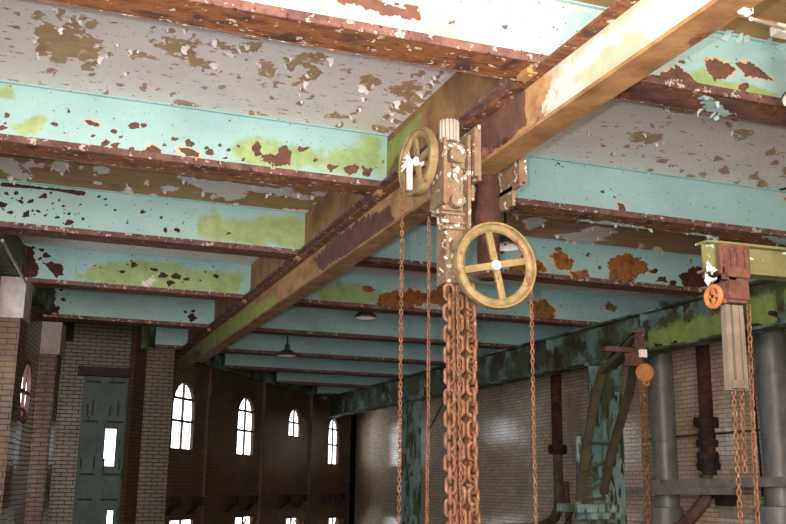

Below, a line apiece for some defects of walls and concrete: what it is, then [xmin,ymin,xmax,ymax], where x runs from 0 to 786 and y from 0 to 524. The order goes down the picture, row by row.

corrosion [255,0,508,45]
peeling [30,8,334,107]
peeling [324,69,445,133]
peeling [653,94,755,142]
corrosion [628,51,786,127]
leakage [218,108,427,181]
peeling [0,157,83,185]
peeling [143,174,328,213]
leakage [189,204,305,249]
corrosion [500,251,525,271]
corrosion [534,245,709,288]
leakage [65,254,279,372]